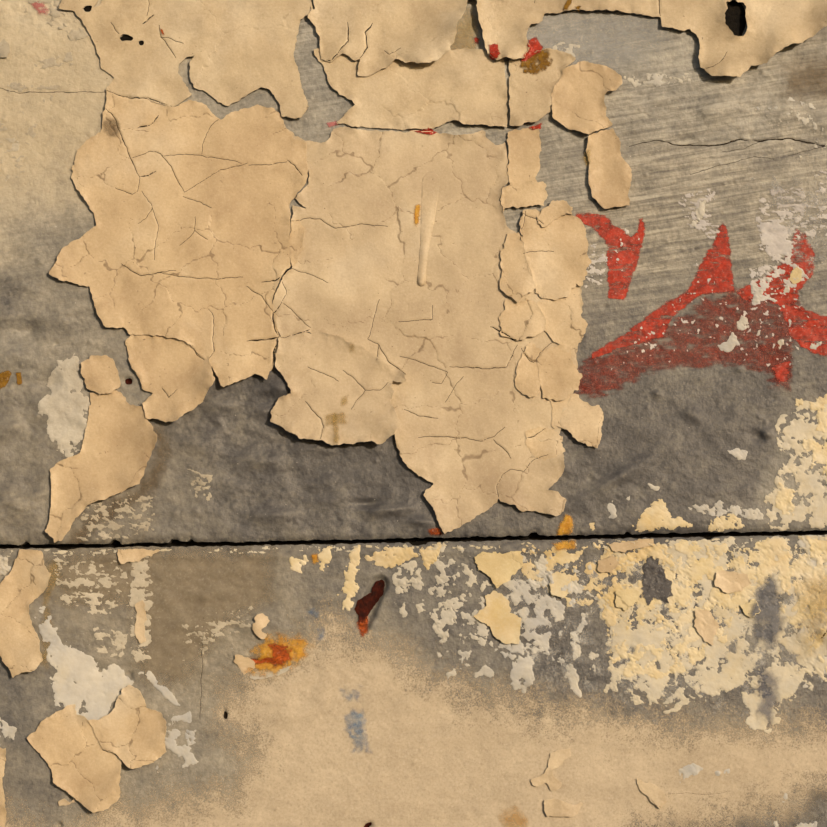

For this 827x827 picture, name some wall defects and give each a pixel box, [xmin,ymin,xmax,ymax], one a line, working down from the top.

crack [629,138,827,175]
peeling [28,0,827,543]
peeling [289,546,333,573]
peeling [342,394,827,734]
corrosion [355,579,385,636]
peeling [186,613,270,640]
peeling [0,548,199,813]
peeling [234,654,291,680]
corrosion [250,637,307,674]